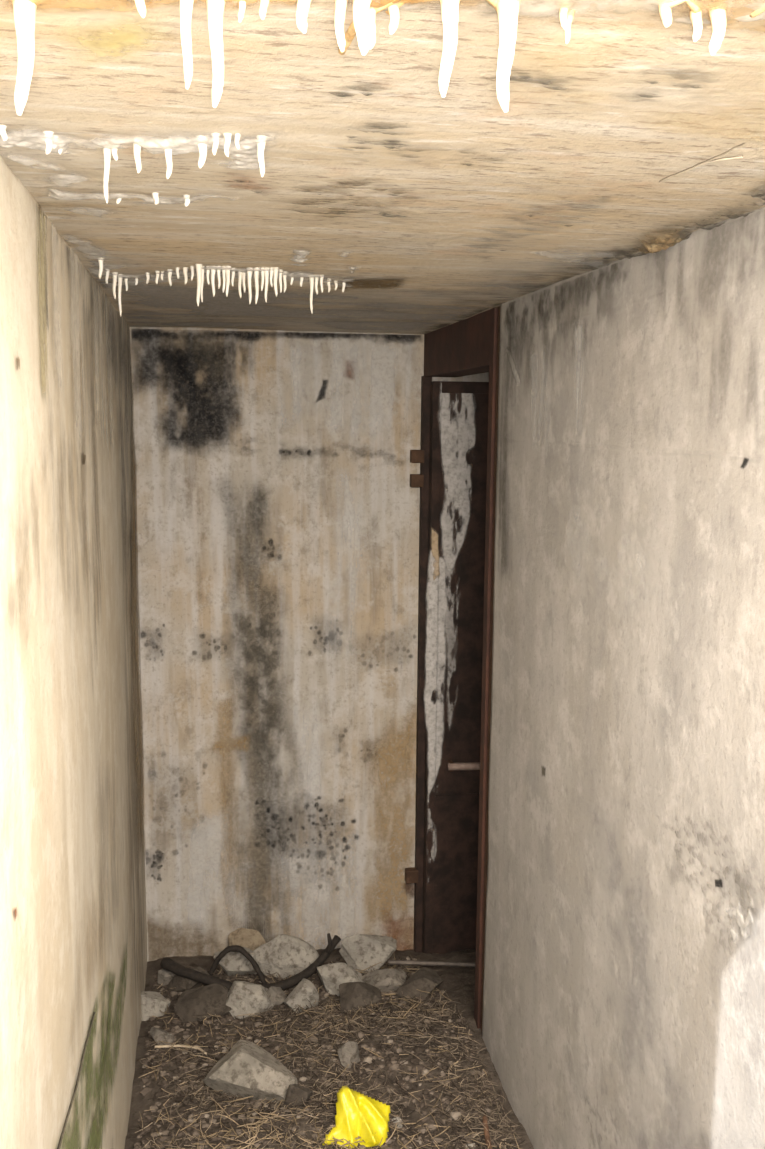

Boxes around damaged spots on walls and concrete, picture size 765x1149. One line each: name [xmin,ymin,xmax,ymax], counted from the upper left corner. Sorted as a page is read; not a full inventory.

damp [30,0,207,11]
damp [224,0,296,8]
damp [370,0,440,15]
damp [517,0,640,16]
damp [654,0,765,32]
damp [338,21,356,55]
damp [0,131,626,448]
peeling [425,384,475,859]
damp [214,505,358,940]
damp [87,948,127,1149]